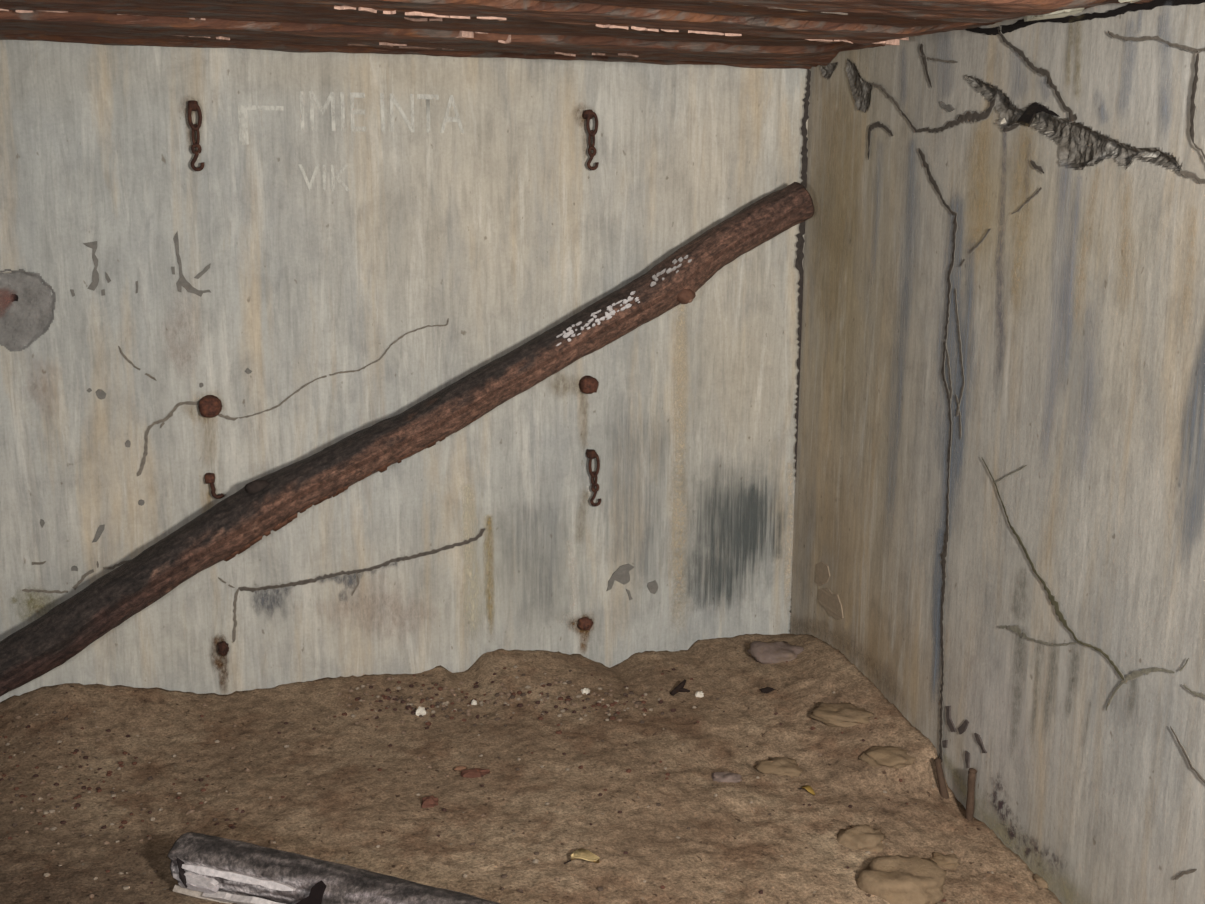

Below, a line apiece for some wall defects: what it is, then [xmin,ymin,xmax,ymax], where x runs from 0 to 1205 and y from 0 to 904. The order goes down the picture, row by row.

spalling [820,58,871,113]
crack [997,26,1077,123]
spalling [964,75,1182,173]
crack [1108,31,1205,184]
spalling [0,269,56,352]
spalling [70,241,111,297]
crack [137,318,449,476]
damp [673,304,793,603]
crack [868,82,1044,762]
crack [218,528,486,642]
crack [982,458,1205,711]
rust [214,637,228,685]